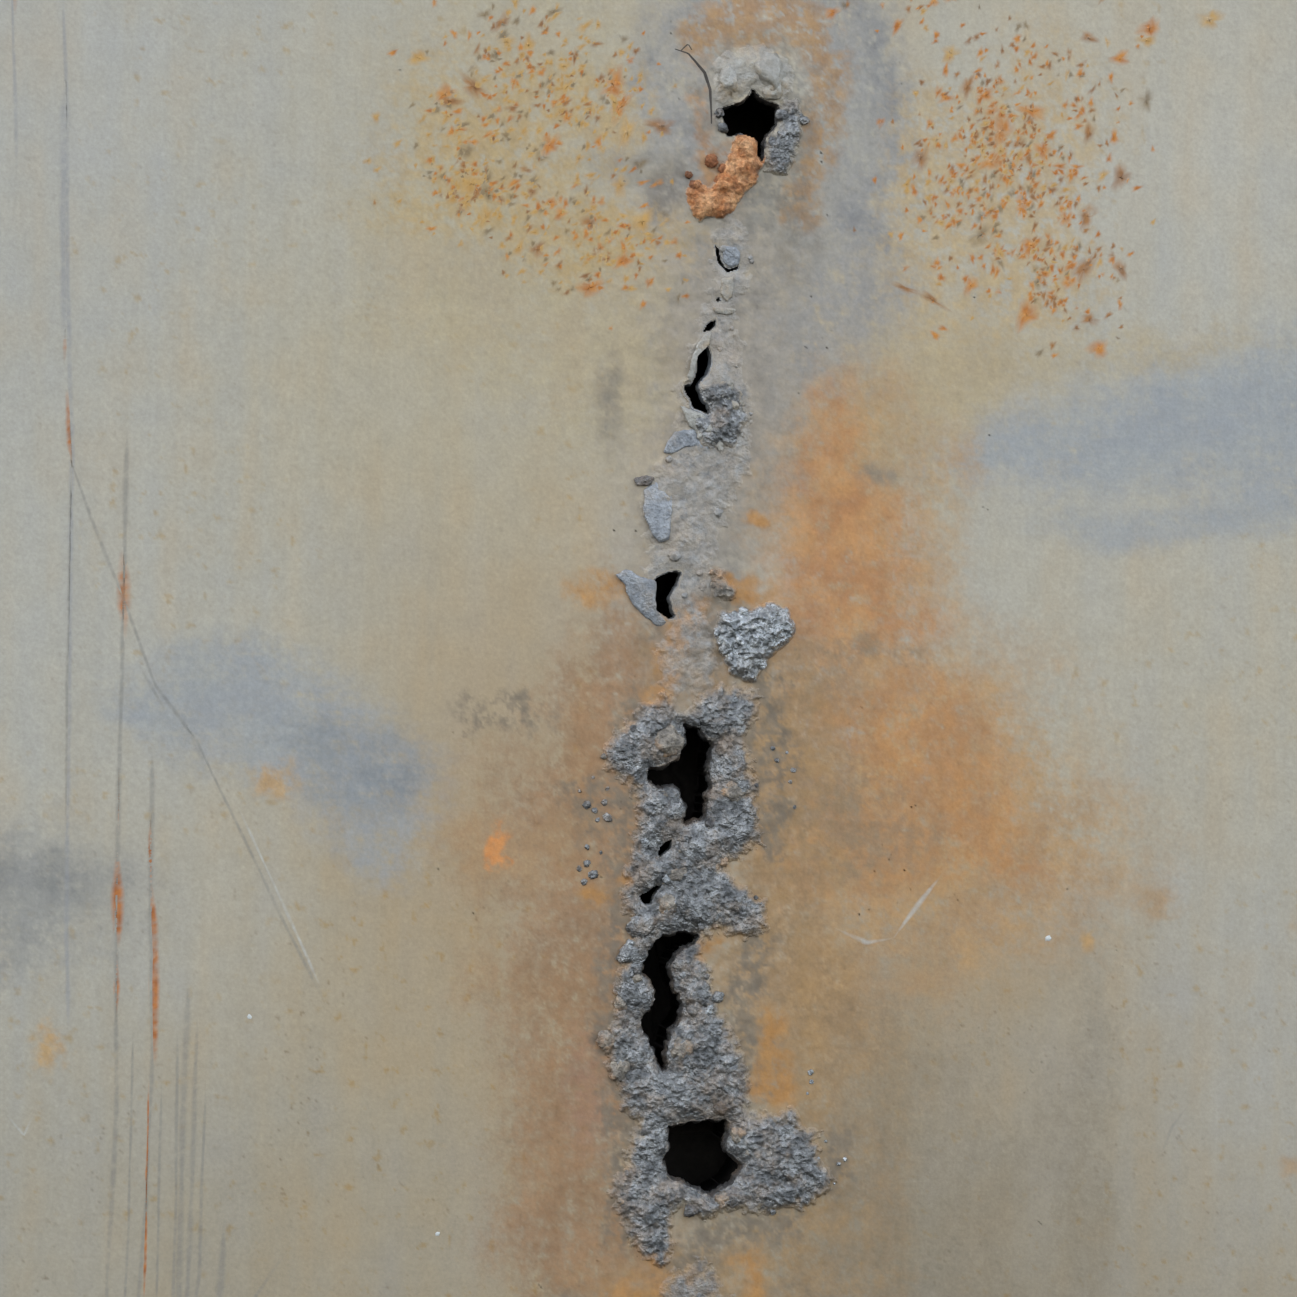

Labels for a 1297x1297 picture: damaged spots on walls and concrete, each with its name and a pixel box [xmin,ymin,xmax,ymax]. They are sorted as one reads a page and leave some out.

corrosion [1193,8,1228,31]
corrosion [337,0,725,312]
corrosion [115,547,133,641]
corrosion [712,0,1213,1038]
water stain [0,468,179,949]
corrosion [109,853,126,1020]
corrosion [147,814,161,1065]
corrosion [701,930,731,965]
corrosion [748,997,806,1114]
corrosion [584,1255,677,1297]